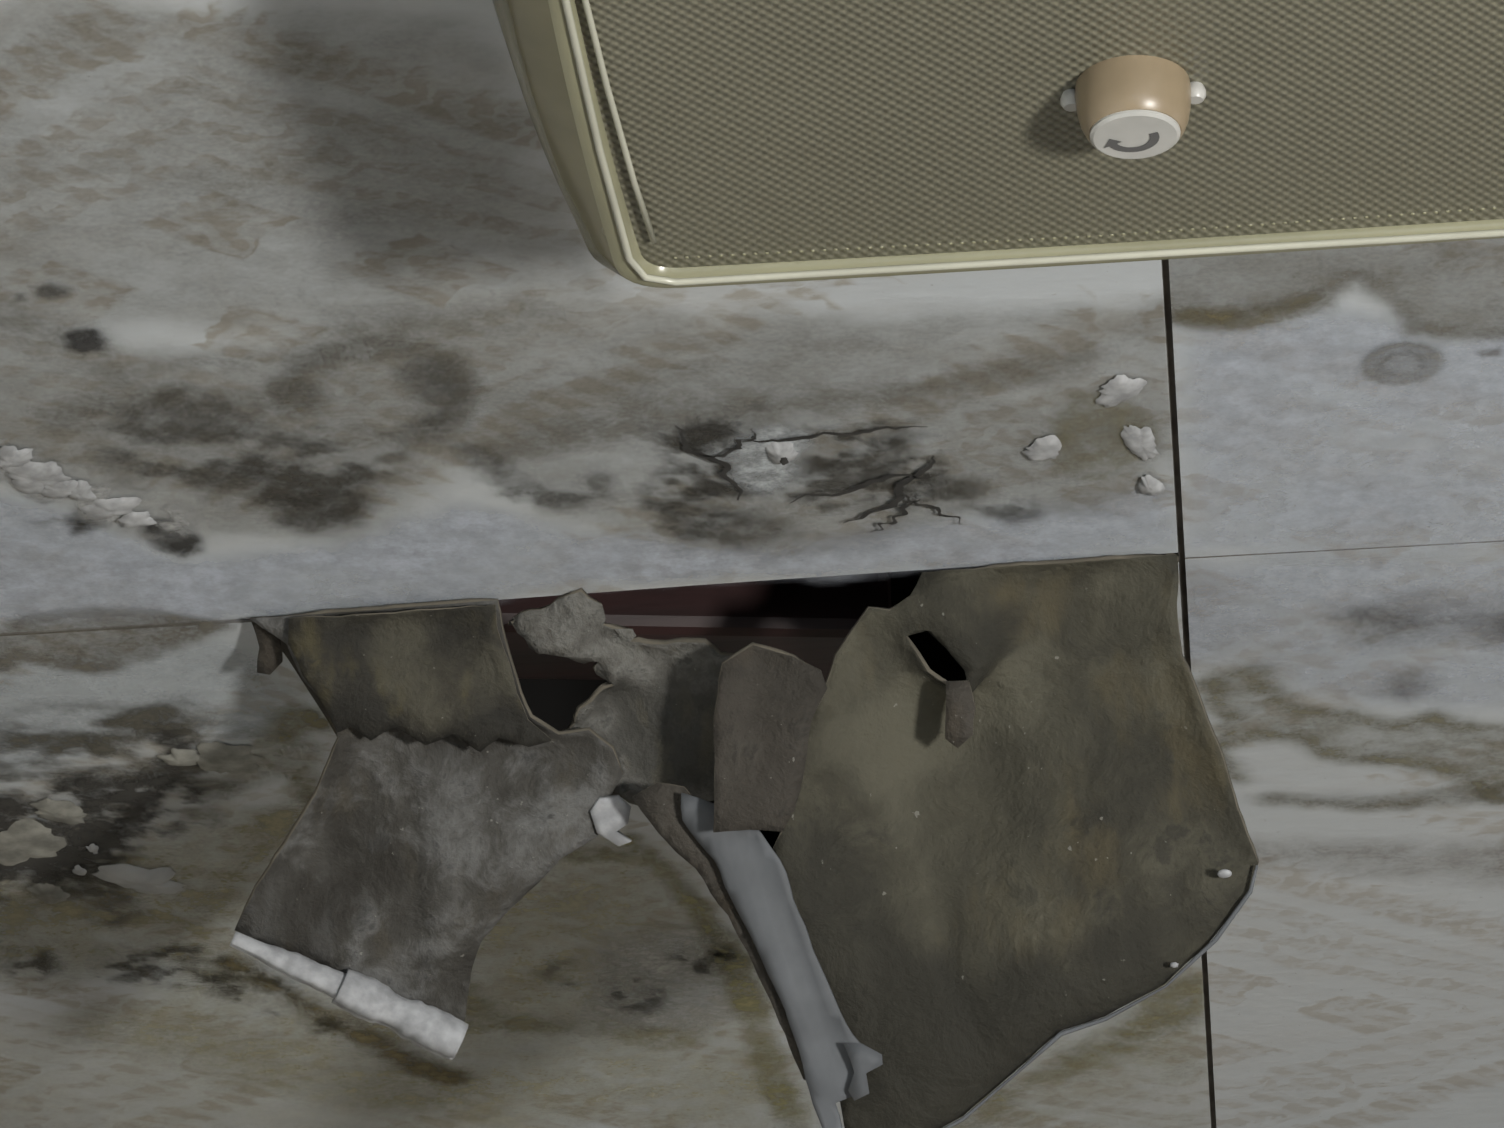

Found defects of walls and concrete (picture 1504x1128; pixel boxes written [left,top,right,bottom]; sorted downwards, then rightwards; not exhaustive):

damp [40,287,67,298]
damp [67,330,103,352]
damp [1170,243,1504,468]
damp [0,375,1165,685]
damp [1200,668,1504,804]
damp [0,704,588,1111]
damp [465,836,797,1116]